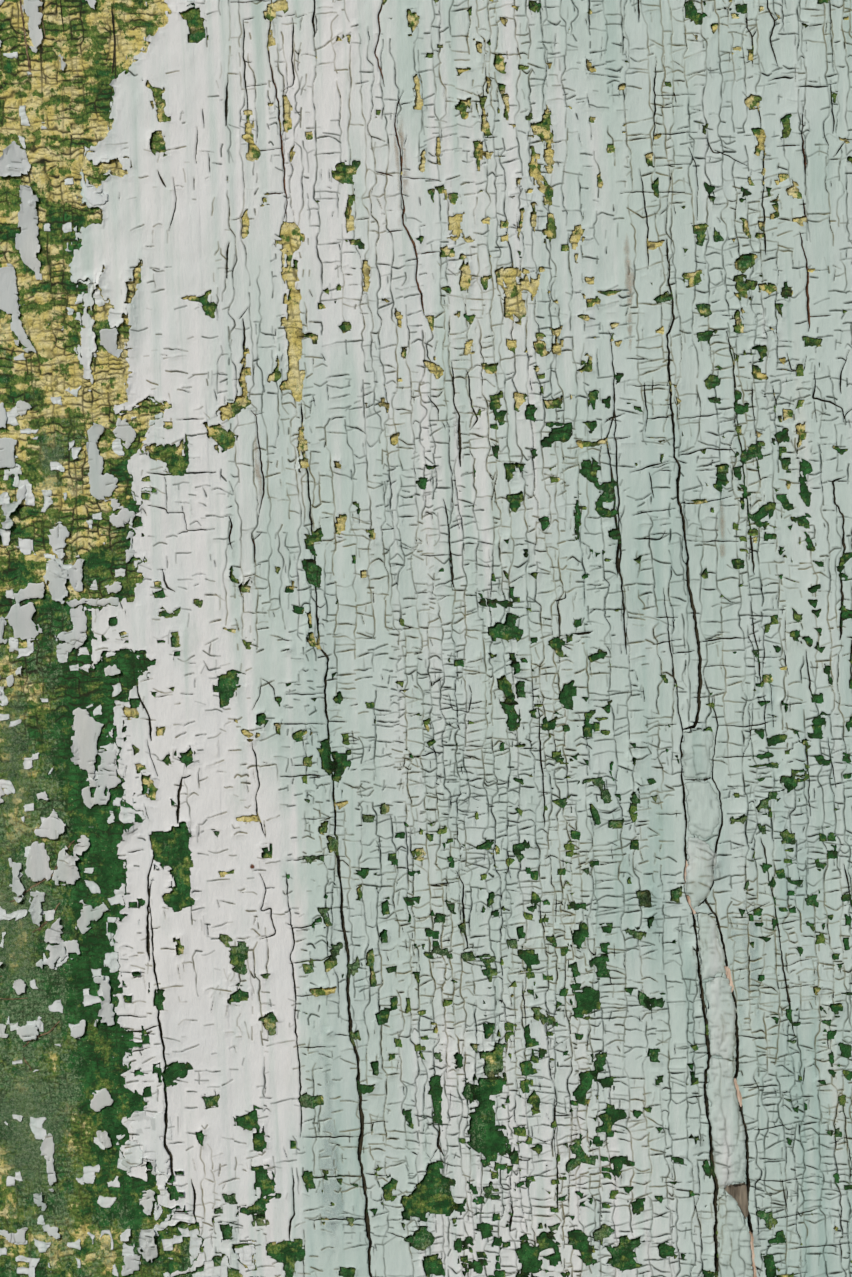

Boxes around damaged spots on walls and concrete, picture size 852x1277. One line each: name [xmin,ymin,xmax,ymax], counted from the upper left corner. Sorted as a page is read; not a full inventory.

crack [109,6,117,73]
crack [158,0,339,226]
peeling [267,221,318,404]
peeling [419,39,649,579]
peeling [0,0,305,1277]
crack [133,651,211,823]
crack [143,473,206,534]
peeling [234,713,351,864]
peeling [275,501,361,651]
crack [188,0,852,1277]
peeling [298,570,709,1277]
crack [121,850,234,1230]